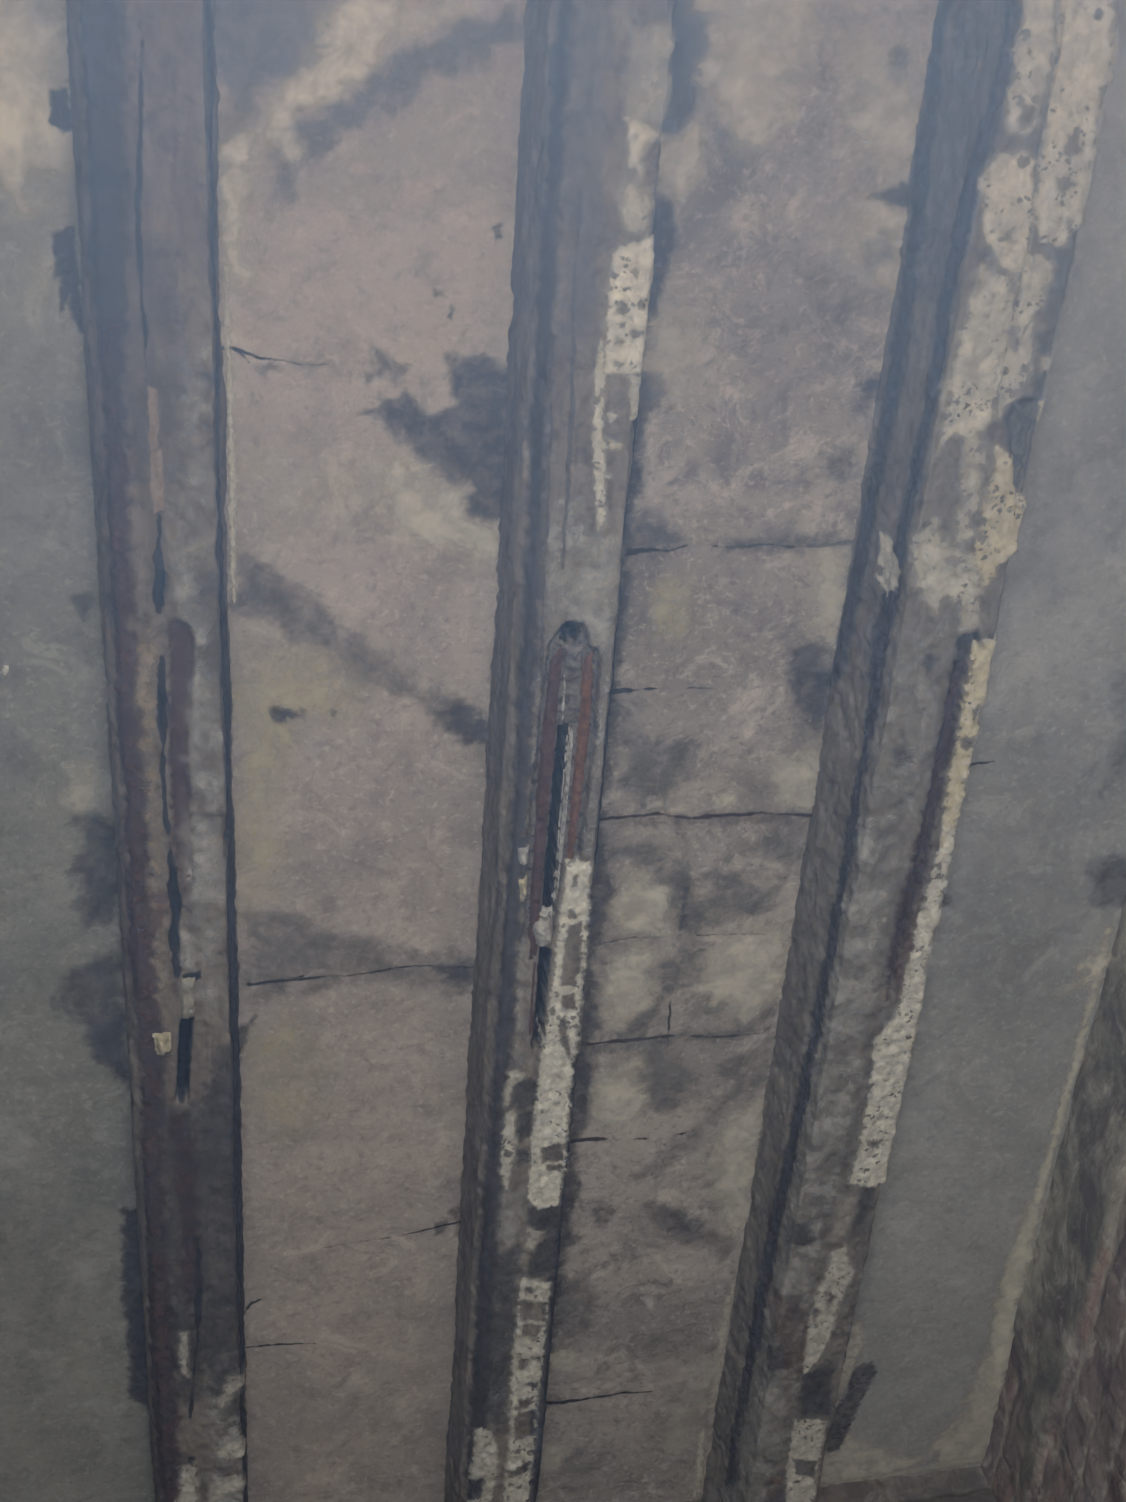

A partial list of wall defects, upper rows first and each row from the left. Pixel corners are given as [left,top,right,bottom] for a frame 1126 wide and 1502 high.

corrosion [79,0,182,1502]
crack [247,965,468,986]
damp [364,355,508,558]
spalling [500,621,600,1210]
peeling [591,116,657,530]
damp [476,803,783,1421]
crack [579,1004,758,1046]
crack [599,812,812,820]
damp [643,0,809,332]
corrosion [887,632,980,1000]
peeling [850,0,1117,1187]
peeling [468,1277,551,1502]